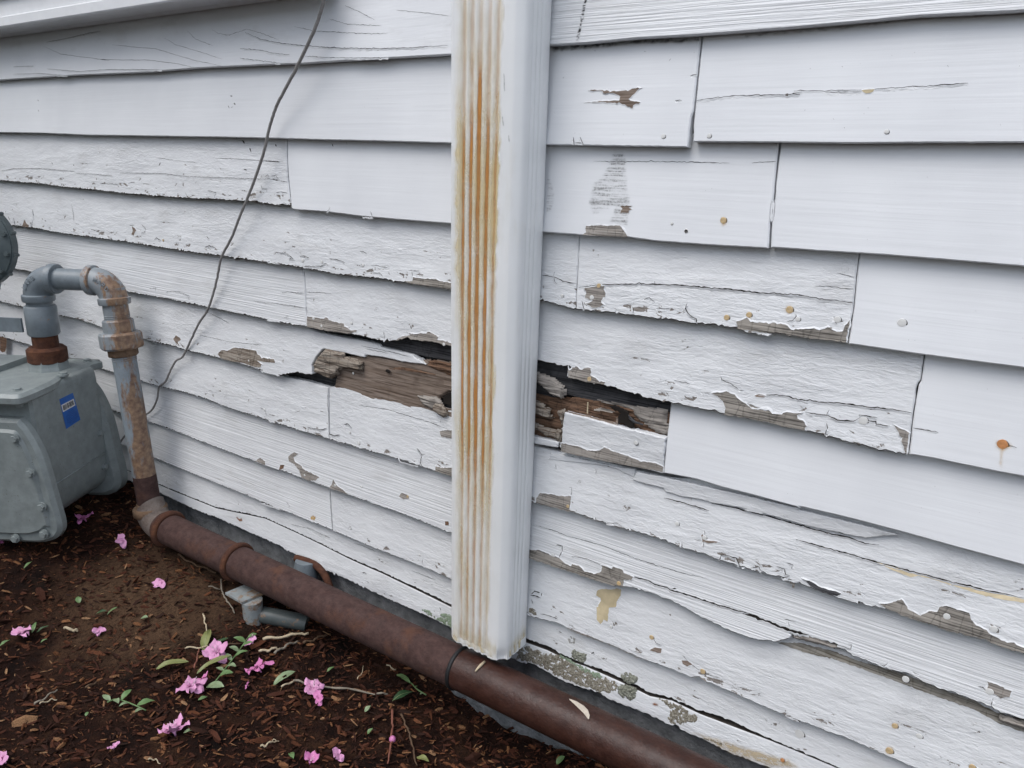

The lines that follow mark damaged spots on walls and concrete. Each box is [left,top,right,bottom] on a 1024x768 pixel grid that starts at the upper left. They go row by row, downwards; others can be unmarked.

peeling [583,86,642,110]
crack [675,74,968,103]
peeling [583,204,633,237]
rust [456,72,499,491]
peeling [735,316,851,342]
peeling [218,347,276,368]
peeling [568,365,606,385]
spalling [609,405,635,428]
peeling [711,390,808,431]
peeling [529,548,635,624]
peeling [878,598,1024,653]
peeling [779,642,1024,732]